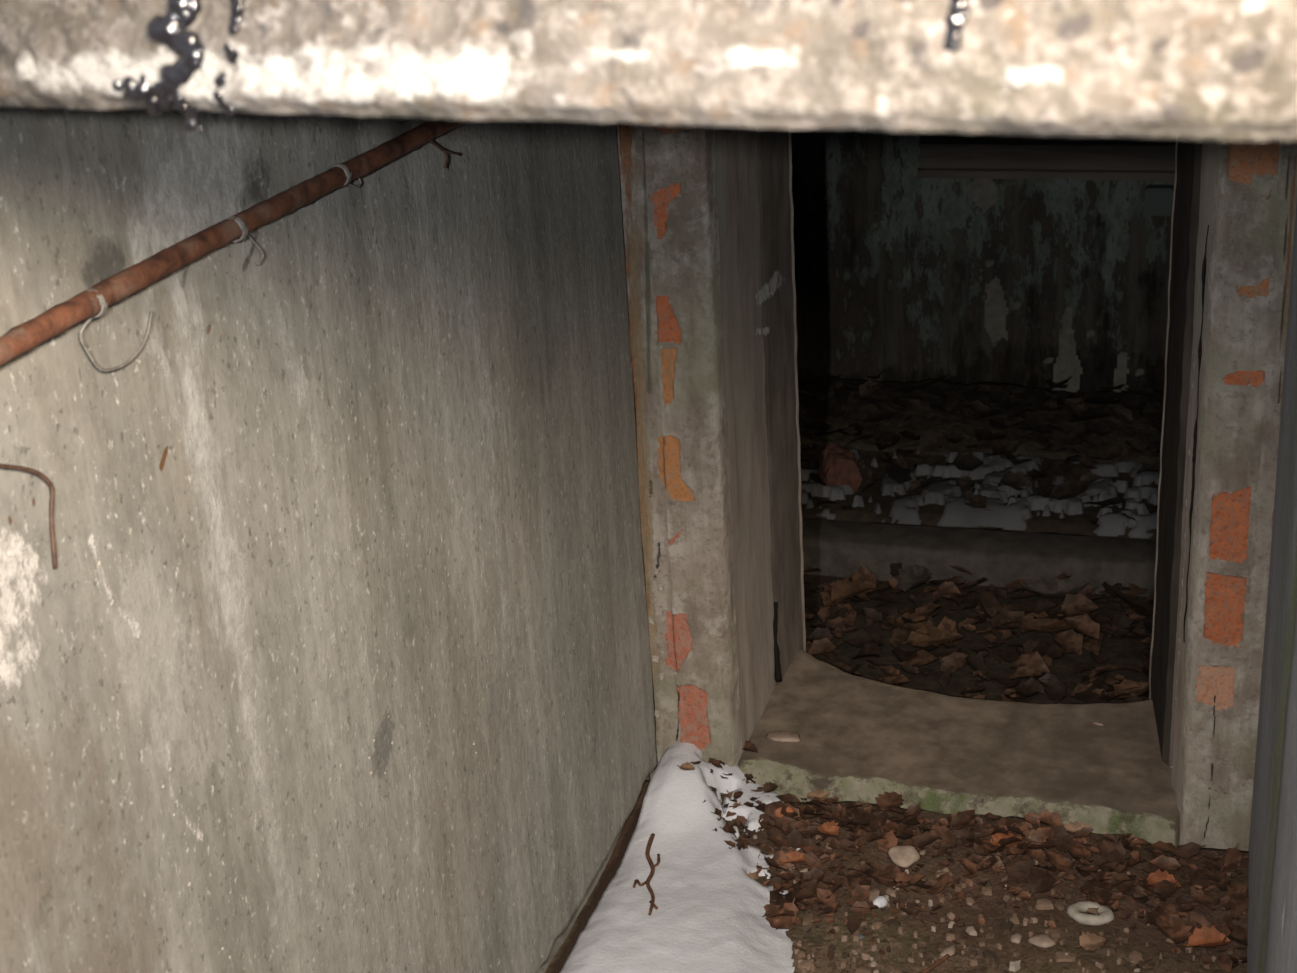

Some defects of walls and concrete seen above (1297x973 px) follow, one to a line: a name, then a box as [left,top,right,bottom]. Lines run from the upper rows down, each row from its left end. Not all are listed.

rust [0,119,466,372]
peeling [984,260,1021,342]
peeling [1042,306,1096,393]
peeling [1113,352,1145,392]